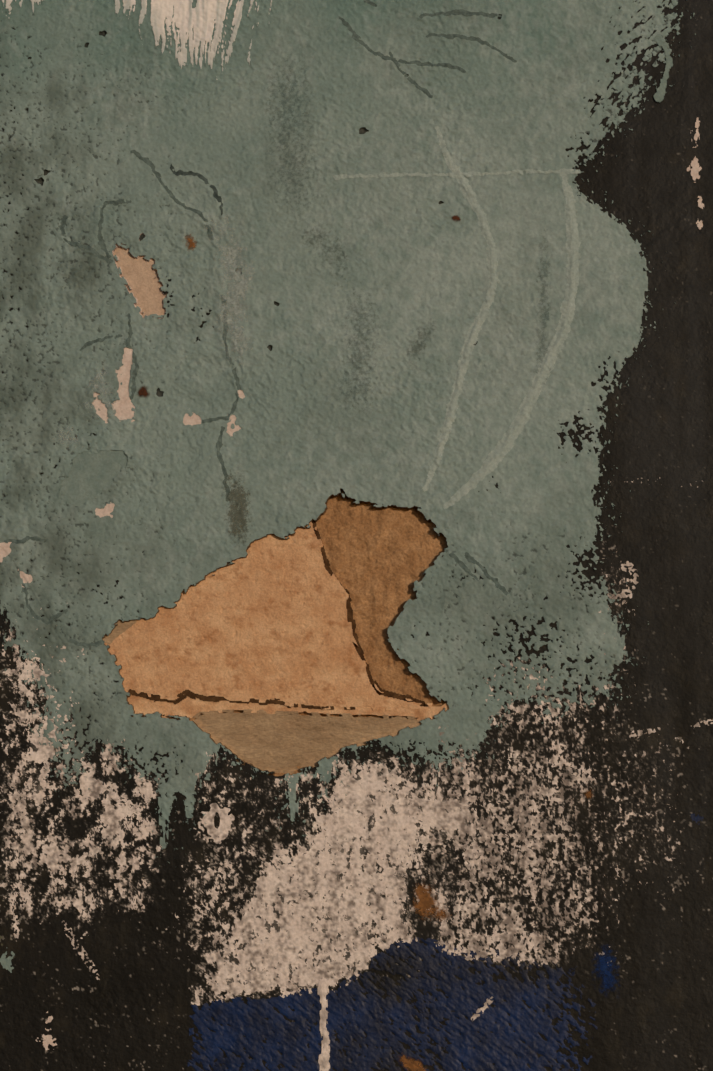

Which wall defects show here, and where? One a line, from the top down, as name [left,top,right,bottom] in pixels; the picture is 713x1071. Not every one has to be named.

peeling [92,347,135,423]
peeling [112,233,167,319]
peeling [0,629,162,949]
peeling [102,489,686,1006]